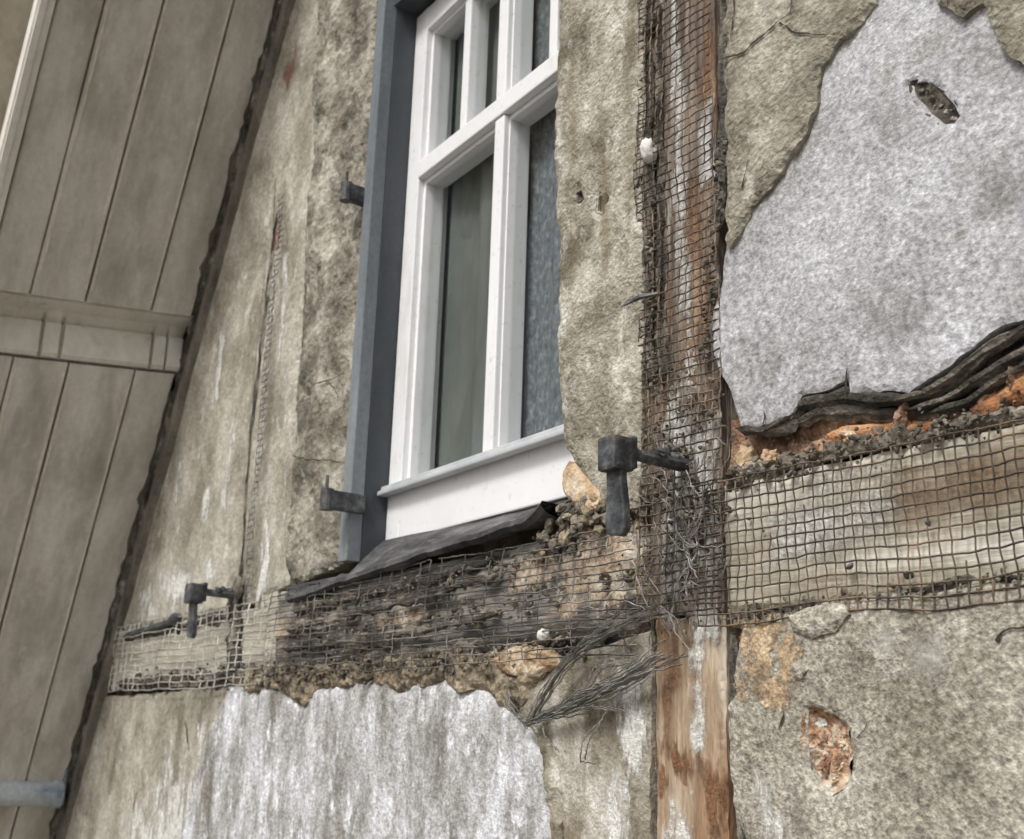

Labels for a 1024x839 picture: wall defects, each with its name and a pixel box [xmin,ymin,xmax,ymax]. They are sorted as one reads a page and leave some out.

rust [700,0,717,157]
crack [722,0,834,60]
rust [681,174,714,391]
flaking render [711,0,1024,476]
flaking render [562,461,604,513]
rust [911,461,1011,505]
peeling [136,568,192,623]
peeling [256,517,270,604]
rust [660,627,680,725]
flaking render [733,601,851,712]
rust [656,742,728,839]
flaking render [800,707,854,796]